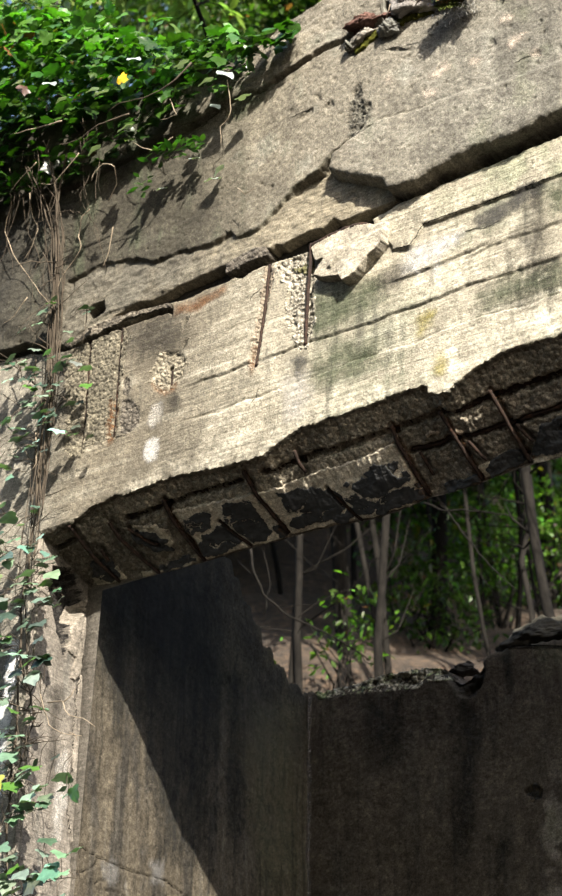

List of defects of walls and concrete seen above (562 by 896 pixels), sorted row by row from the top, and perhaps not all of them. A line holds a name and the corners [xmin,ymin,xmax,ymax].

crack [345,84,372,139]
crack [277,221,374,262]
crack [392,172,562,251]
crack [162,275,258,349]
spalling [63,327,140,459]
spalling [149,352,187,396]
peeling [477,416,562,485]
peeling [131,444,434,572]
spalling [314,667,457,699]